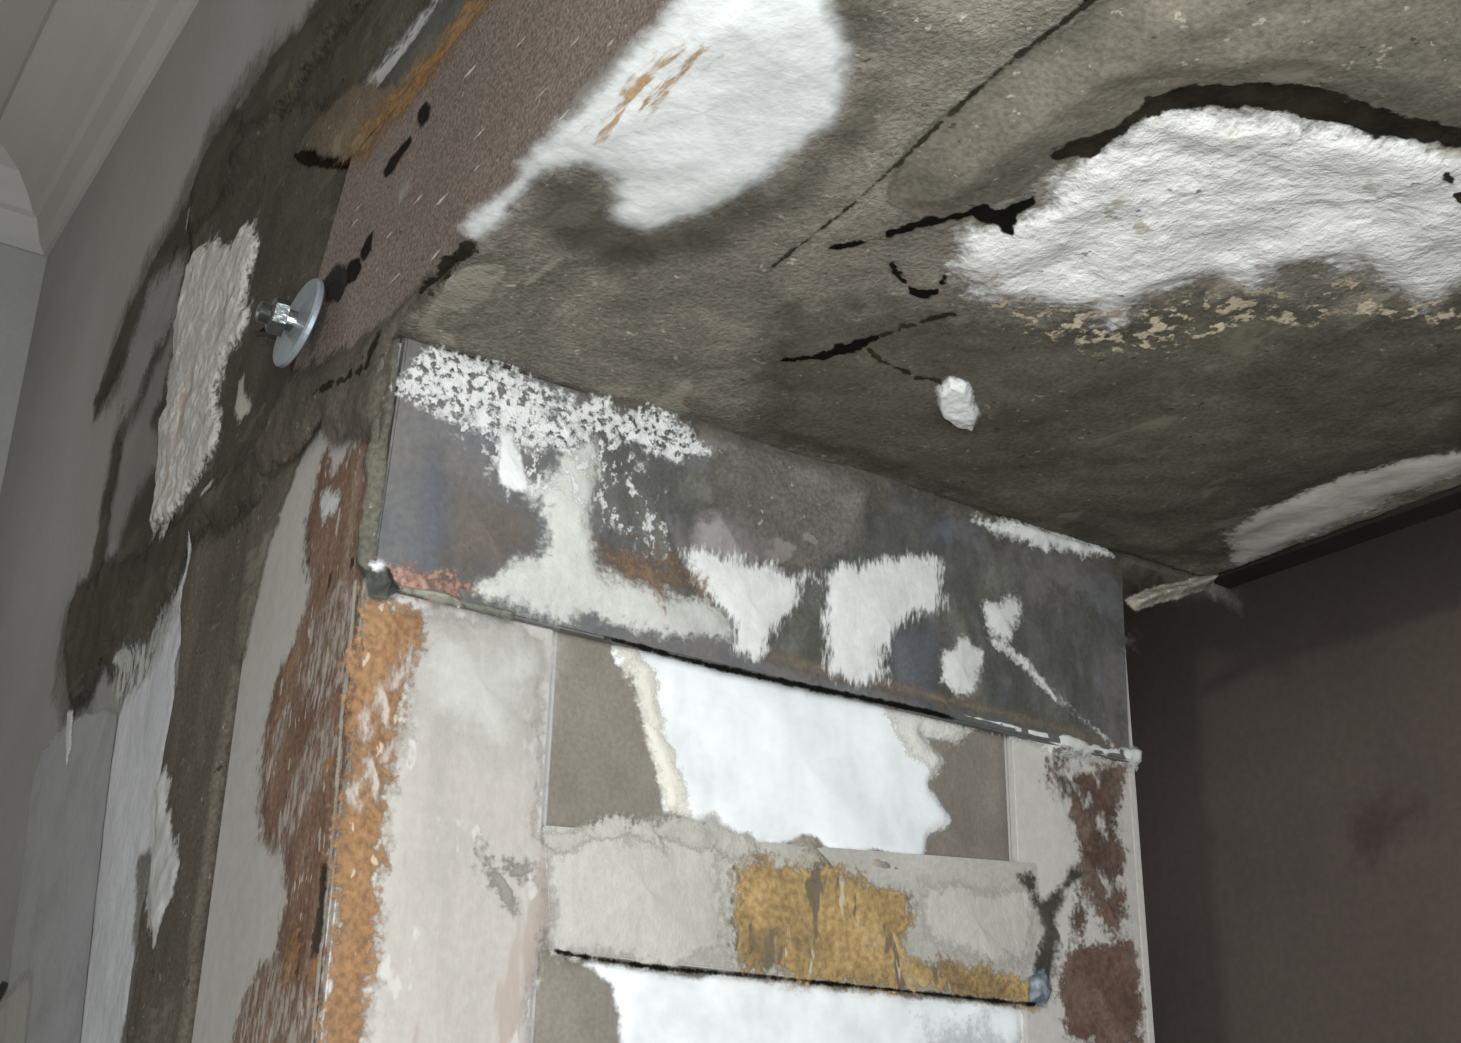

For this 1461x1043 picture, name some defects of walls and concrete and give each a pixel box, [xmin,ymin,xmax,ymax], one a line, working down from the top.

corrosion [338,0,495,161]
crack [772,0,1096,384]
flaking render [945,108,1461,353]
crack [1050,82,1461,203]
peeling [118,219,260,538]
corrosion [233,438,472,1043]
peeling [613,645,692,816]
peeling [884,707,975,780]
corrosion [727,748,1146,1043]